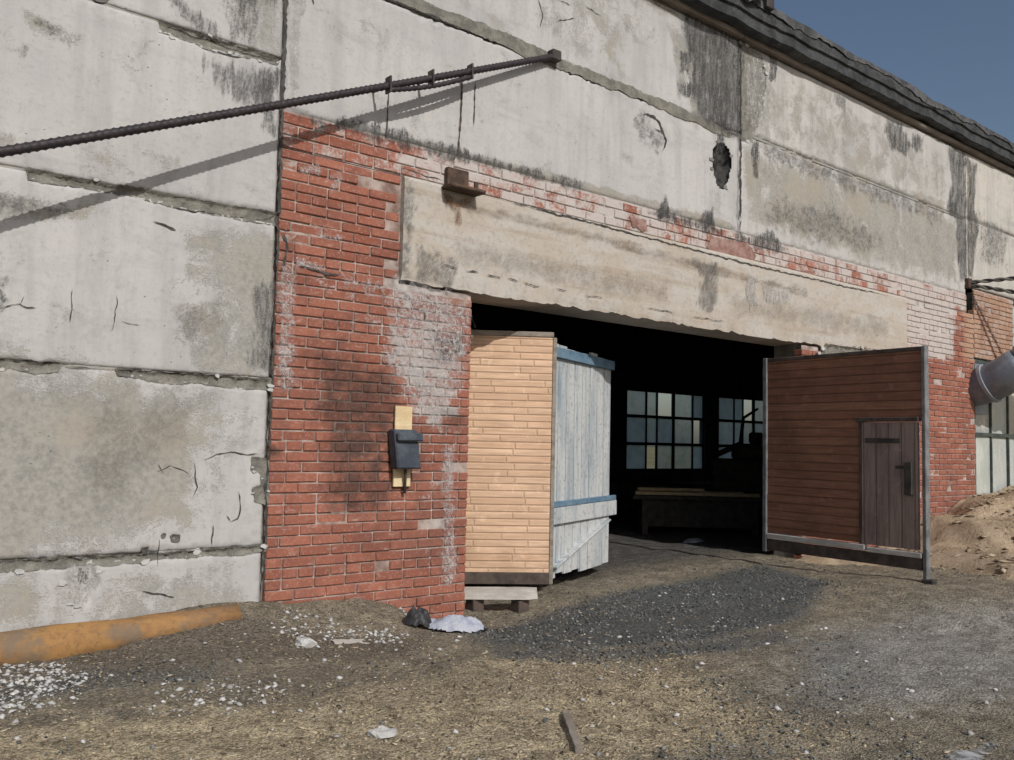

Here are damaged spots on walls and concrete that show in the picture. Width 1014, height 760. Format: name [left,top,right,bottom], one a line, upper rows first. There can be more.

leakage [204,58,285,133]
crack [392,0,478,36]
leakage [653,0,744,160]
crack [0,0,339,601]
leakage [383,187,472,432]
spalling [630,215,647,232]
crack [488,195,882,295]
leakage [751,143,1006,280]
spalling [251,456,270,505]
leakage [441,444,457,583]